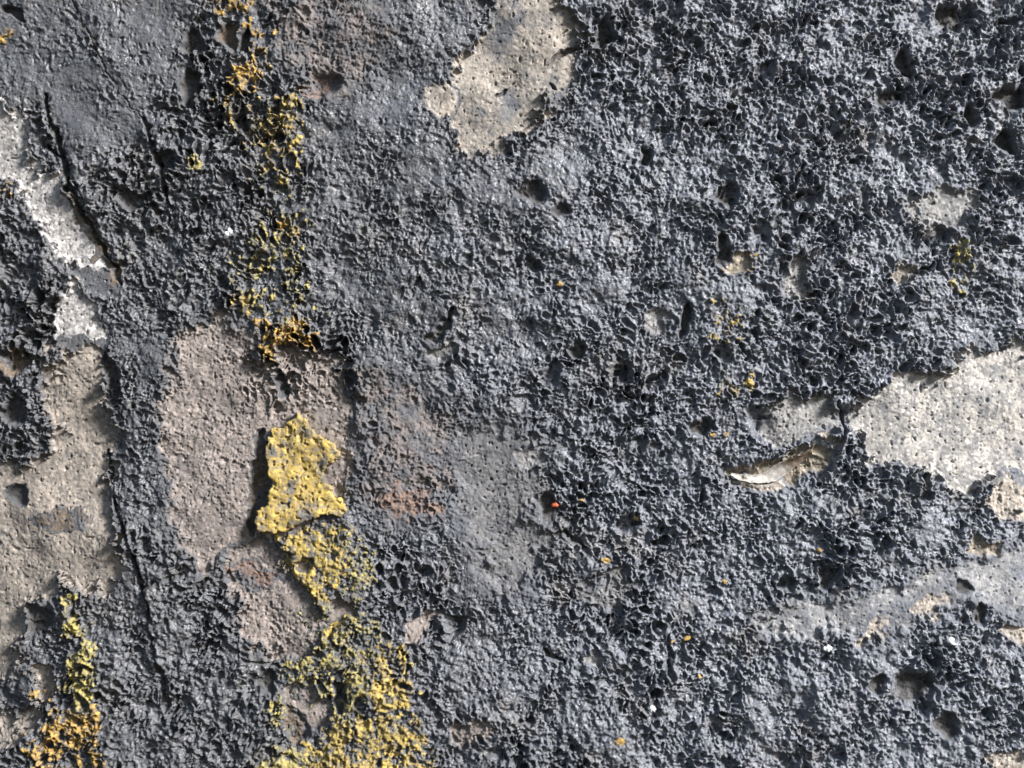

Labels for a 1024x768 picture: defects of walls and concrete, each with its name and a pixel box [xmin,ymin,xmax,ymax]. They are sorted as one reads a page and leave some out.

crack [42,93,88,217]
spalling [420,0,618,169]
spalling [0,92,133,763]
crack [106,449,184,722]
spalling [147,301,366,750]
spalling [720,328,1024,659]